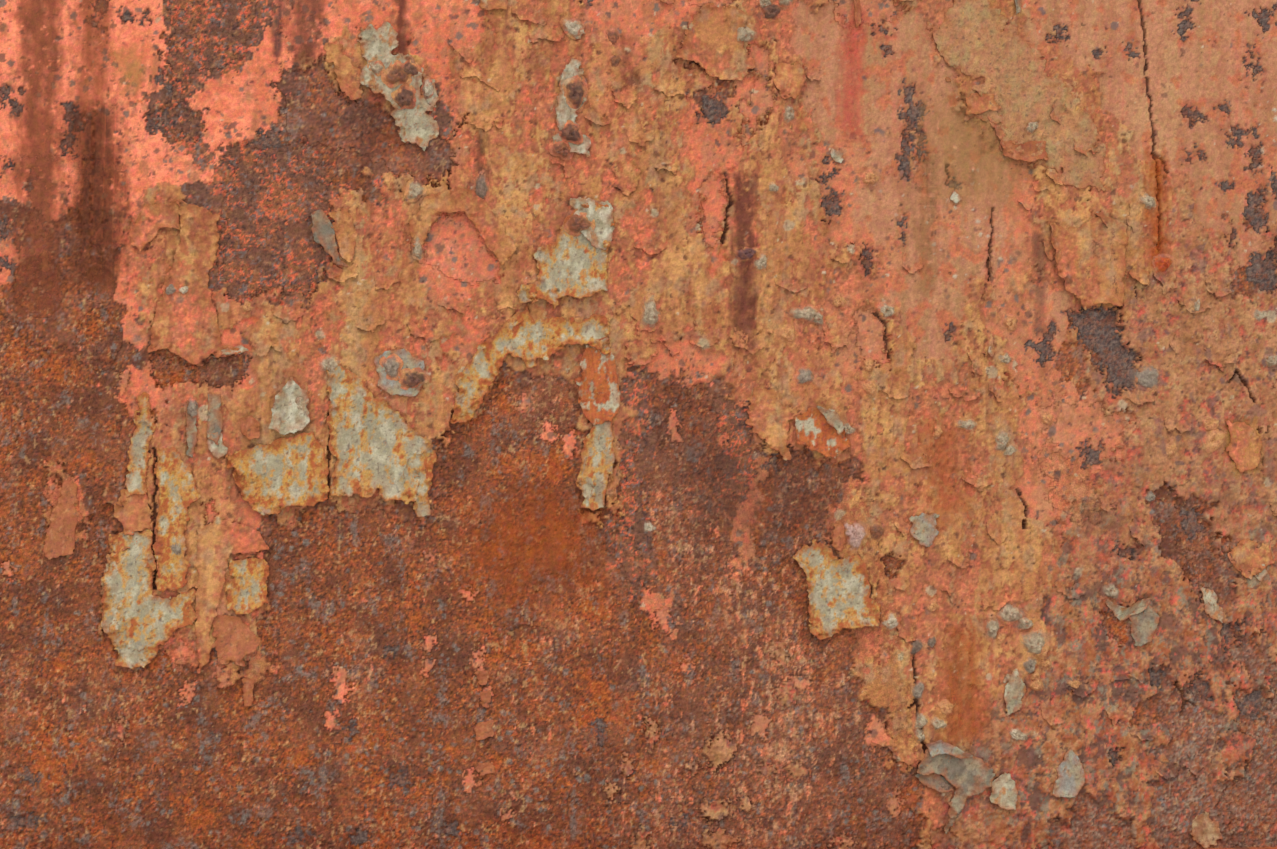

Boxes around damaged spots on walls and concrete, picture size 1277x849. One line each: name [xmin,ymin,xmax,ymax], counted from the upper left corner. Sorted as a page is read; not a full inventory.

rust [15,0,121,311]
rust [274,0,322,62]
peeling [552,58,591,158]
peeling [653,0,821,146]
peeling [926,0,1106,192]
crack [1138,0,1167,246]
peeling [1182,104,1262,170]
peeling [1038,210,1180,527]
spalling [0,129,1018,849]
peeling [1103,598,1160,646]
spalling [1172,497,1275,652]
peeling [1052,748,1085,798]